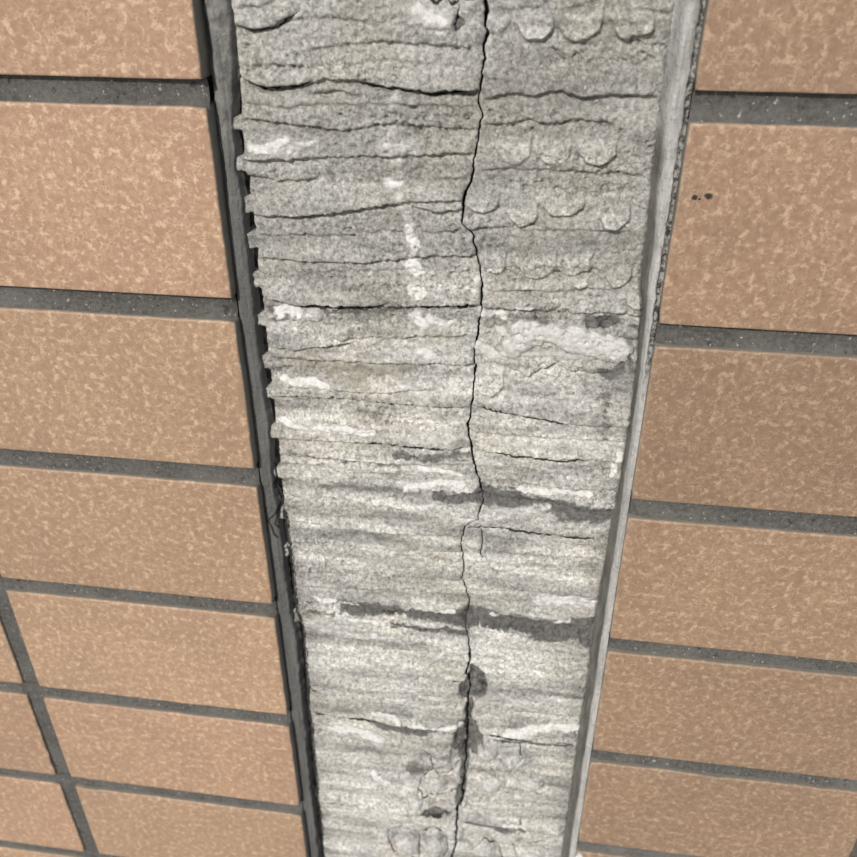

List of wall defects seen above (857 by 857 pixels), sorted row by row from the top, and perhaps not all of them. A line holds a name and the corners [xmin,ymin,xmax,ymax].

crack [257,81,310,89]
peeling [471,315,630,361]
crack [265,0,594,857]
spalling [422,664,488,815]